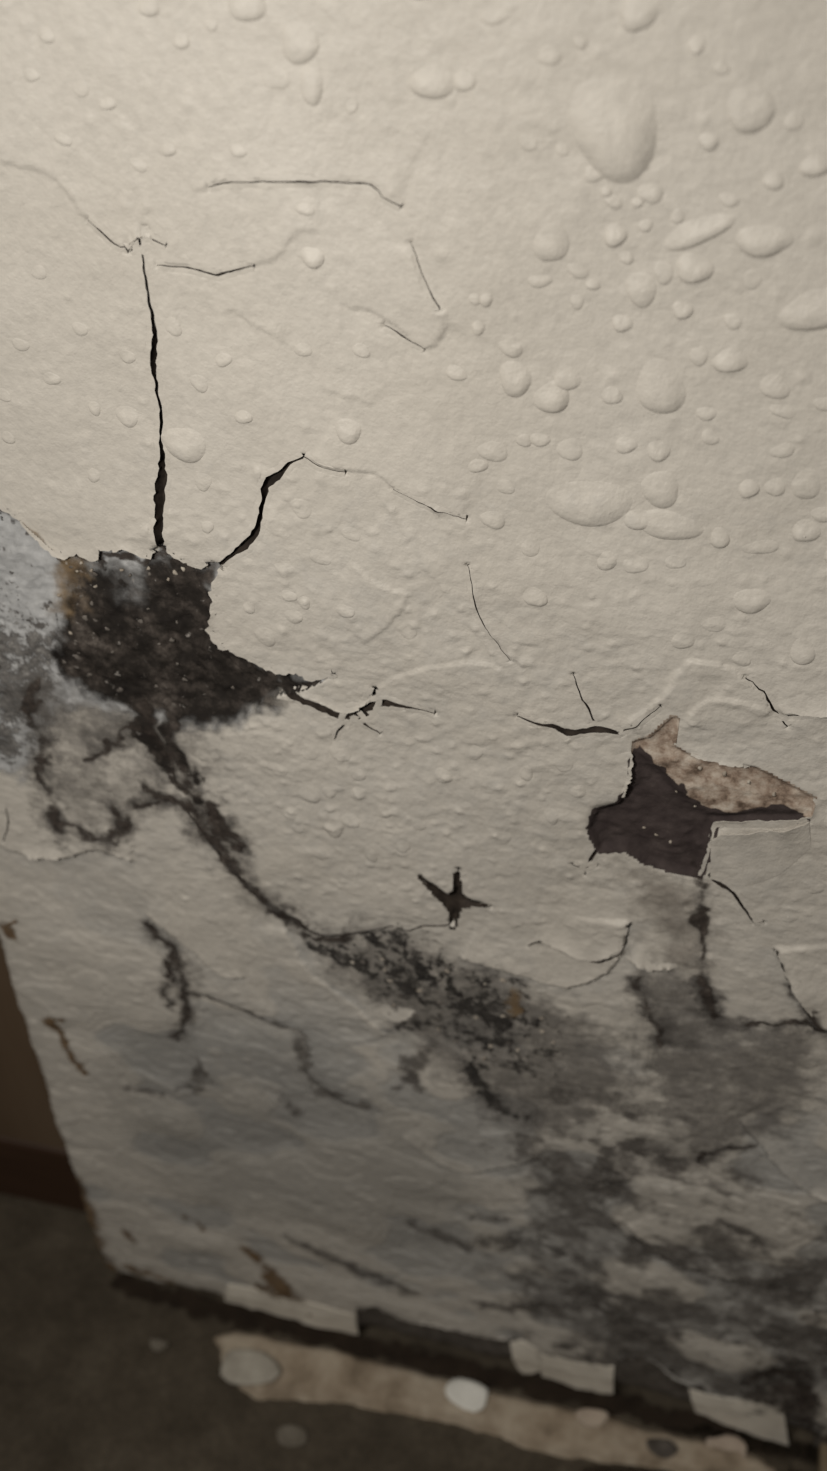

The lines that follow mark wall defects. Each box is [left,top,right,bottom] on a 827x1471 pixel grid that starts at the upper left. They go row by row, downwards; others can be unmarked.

crack [206,173,445,354]
crack [86,215,255,552]
crack [211,452,345,568]
crack [391,486,467,524]
peeling [0,499,374,774]
crack [183,812,490,938]
crack [280,686,435,741]
spalling [585,715,826,886]
leakage [21,556,827,1435]
peeling [221,1284,789,1459]